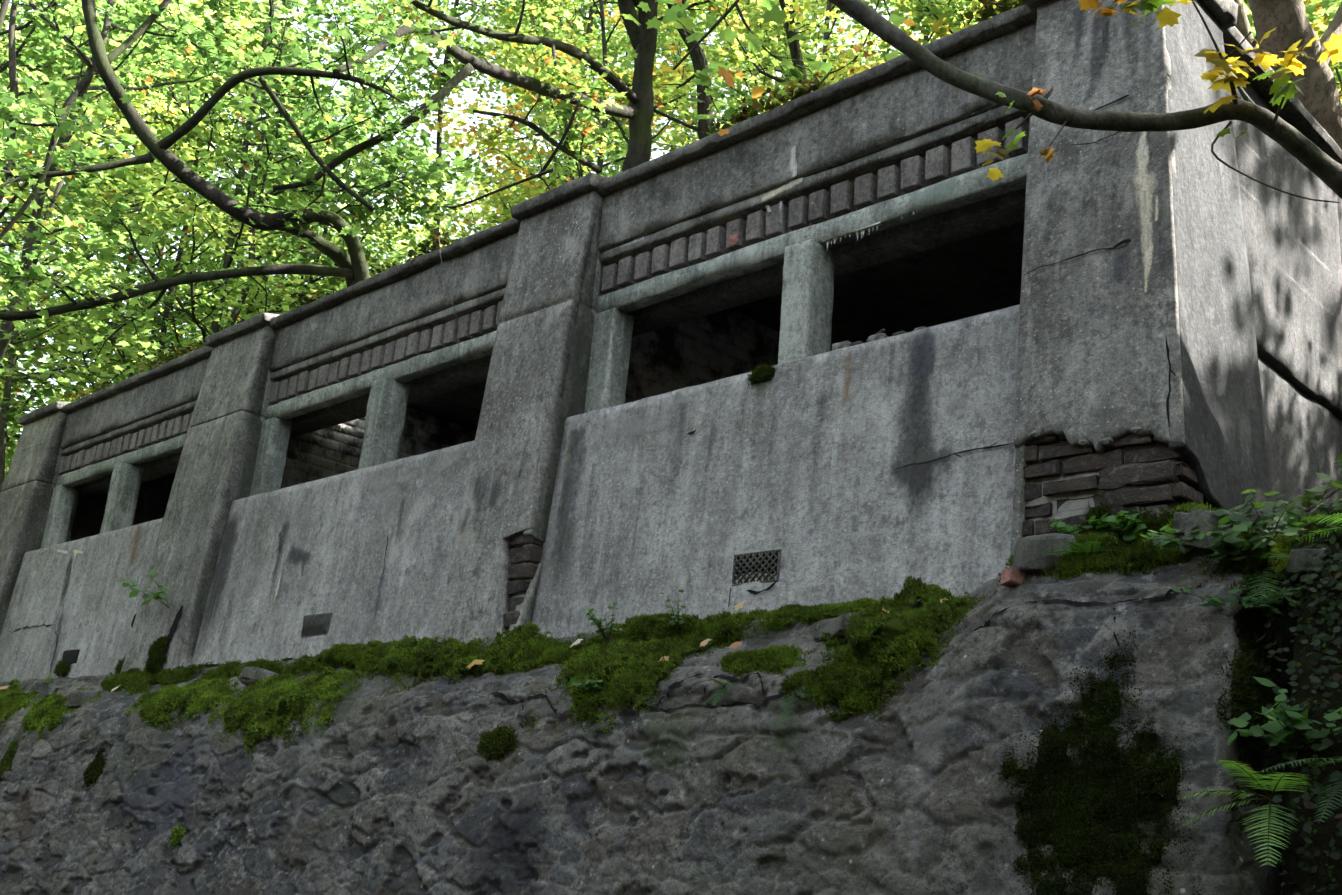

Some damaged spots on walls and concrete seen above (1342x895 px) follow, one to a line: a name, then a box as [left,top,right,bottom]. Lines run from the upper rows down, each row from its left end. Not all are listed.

water stain [1135,132,1158,293]
water stain [894,360,945,489]
crack [1166,338,1176,436]
spalling [1015,426,1205,537]
spalling [503,532,543,631]